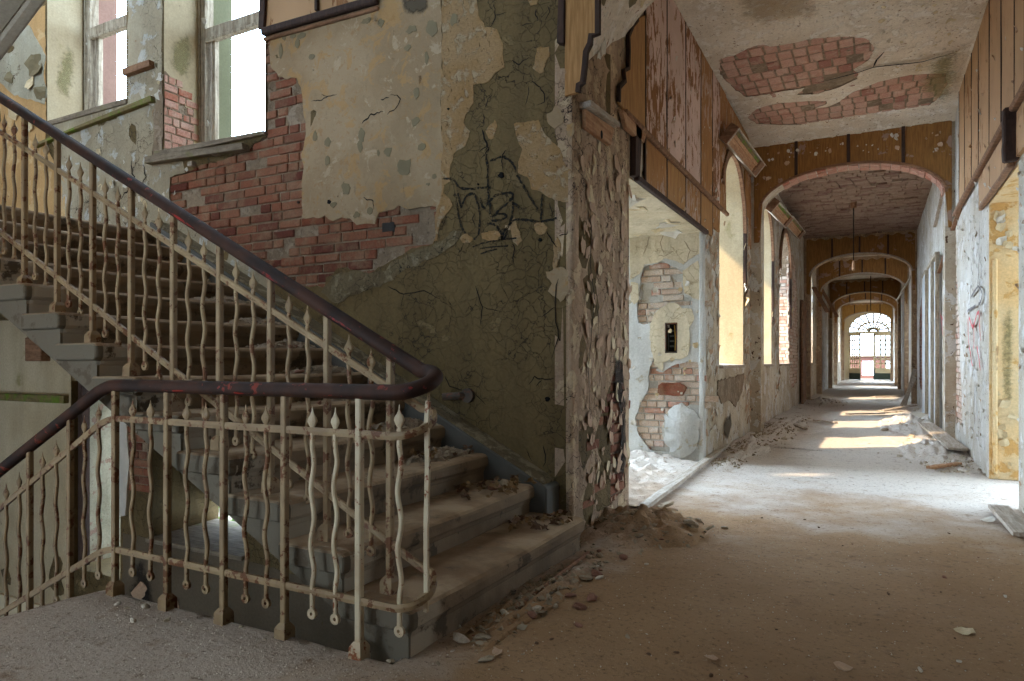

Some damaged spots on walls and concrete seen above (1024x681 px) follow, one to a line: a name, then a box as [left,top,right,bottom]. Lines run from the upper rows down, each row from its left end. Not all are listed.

peeling [0,0,522,332]
crack [362,95,401,123]
peeling [532,47,550,74]
flaking render [710,0,971,125]
crack [529,281,559,386]
peeling [514,105,753,526]